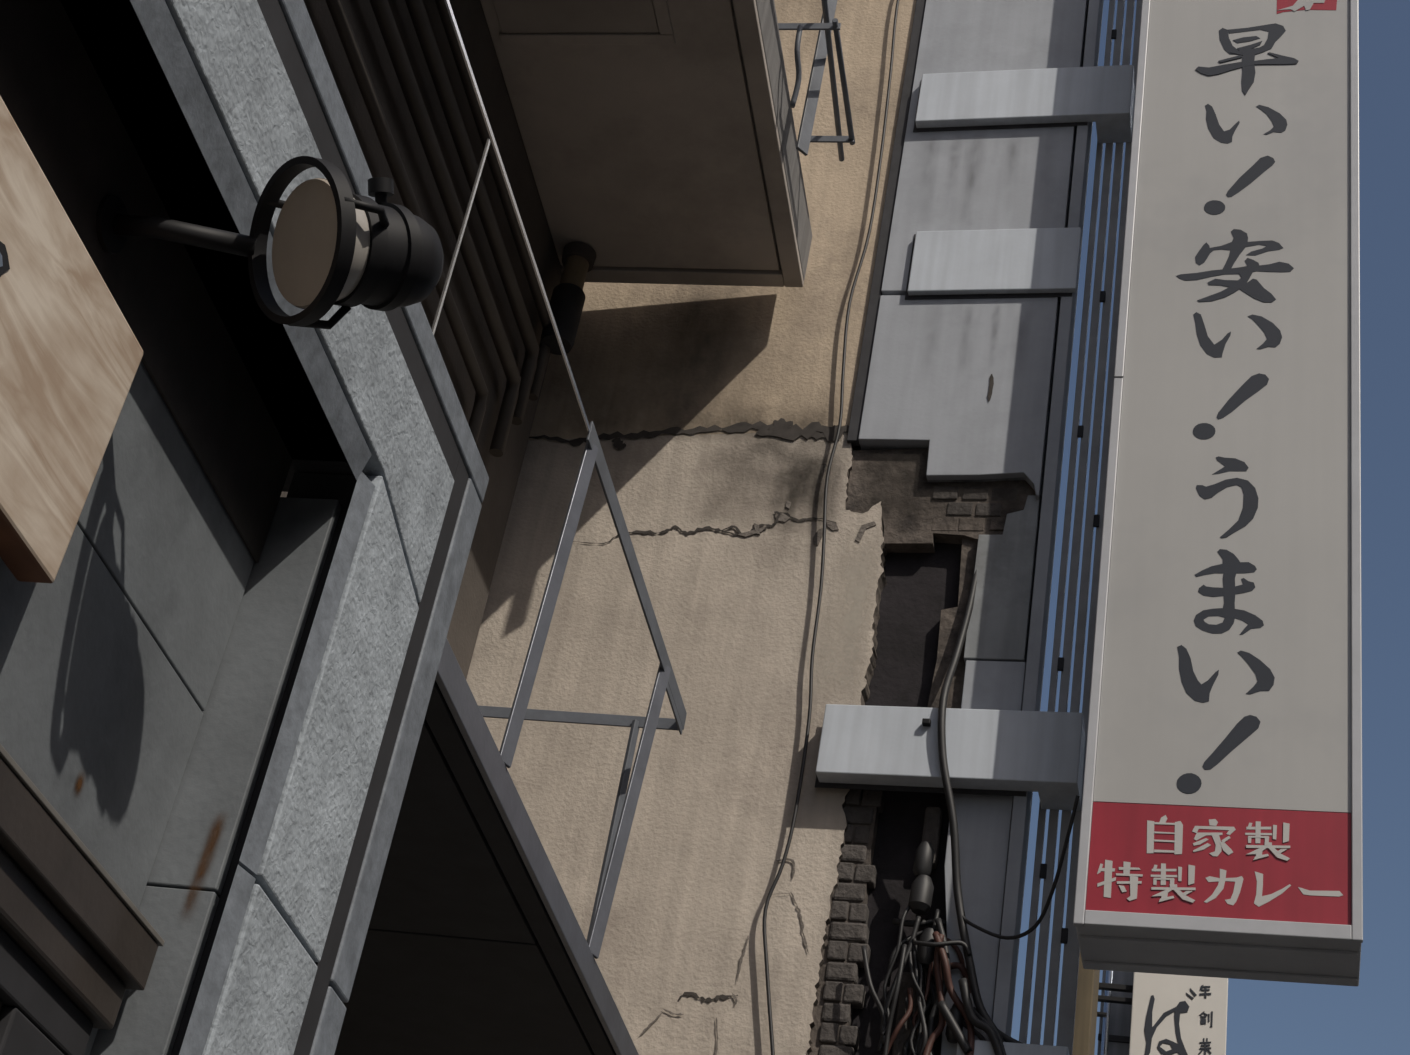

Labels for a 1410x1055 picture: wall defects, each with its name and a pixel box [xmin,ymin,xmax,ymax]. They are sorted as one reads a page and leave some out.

crack [529,418,849,450]
crack [573,511,834,544]
spalling [737,500,791,537]
spalling [813,448,1042,709]
spalling [922,807,943,869]
spalling [809,789,885,1055]
spalling [892,972,918,1055]